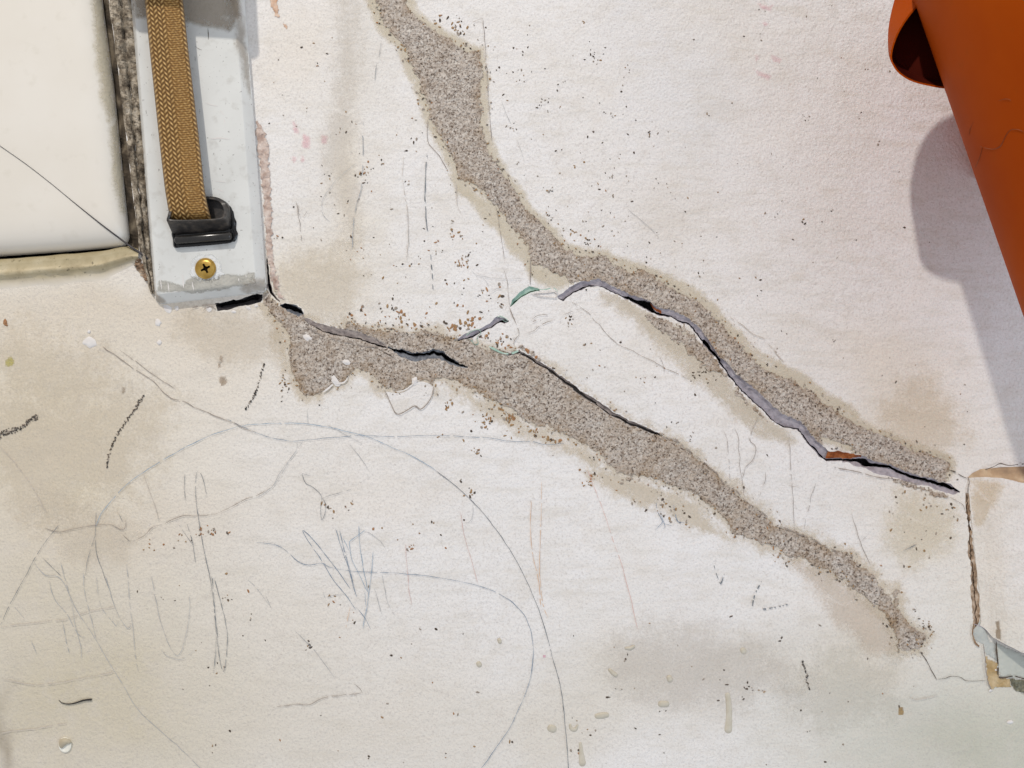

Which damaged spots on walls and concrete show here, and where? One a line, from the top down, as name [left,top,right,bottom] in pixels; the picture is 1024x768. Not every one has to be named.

spalling [230,0,958,658]
crack [280,208,1023,630]
spalling [972,621,1024,692]